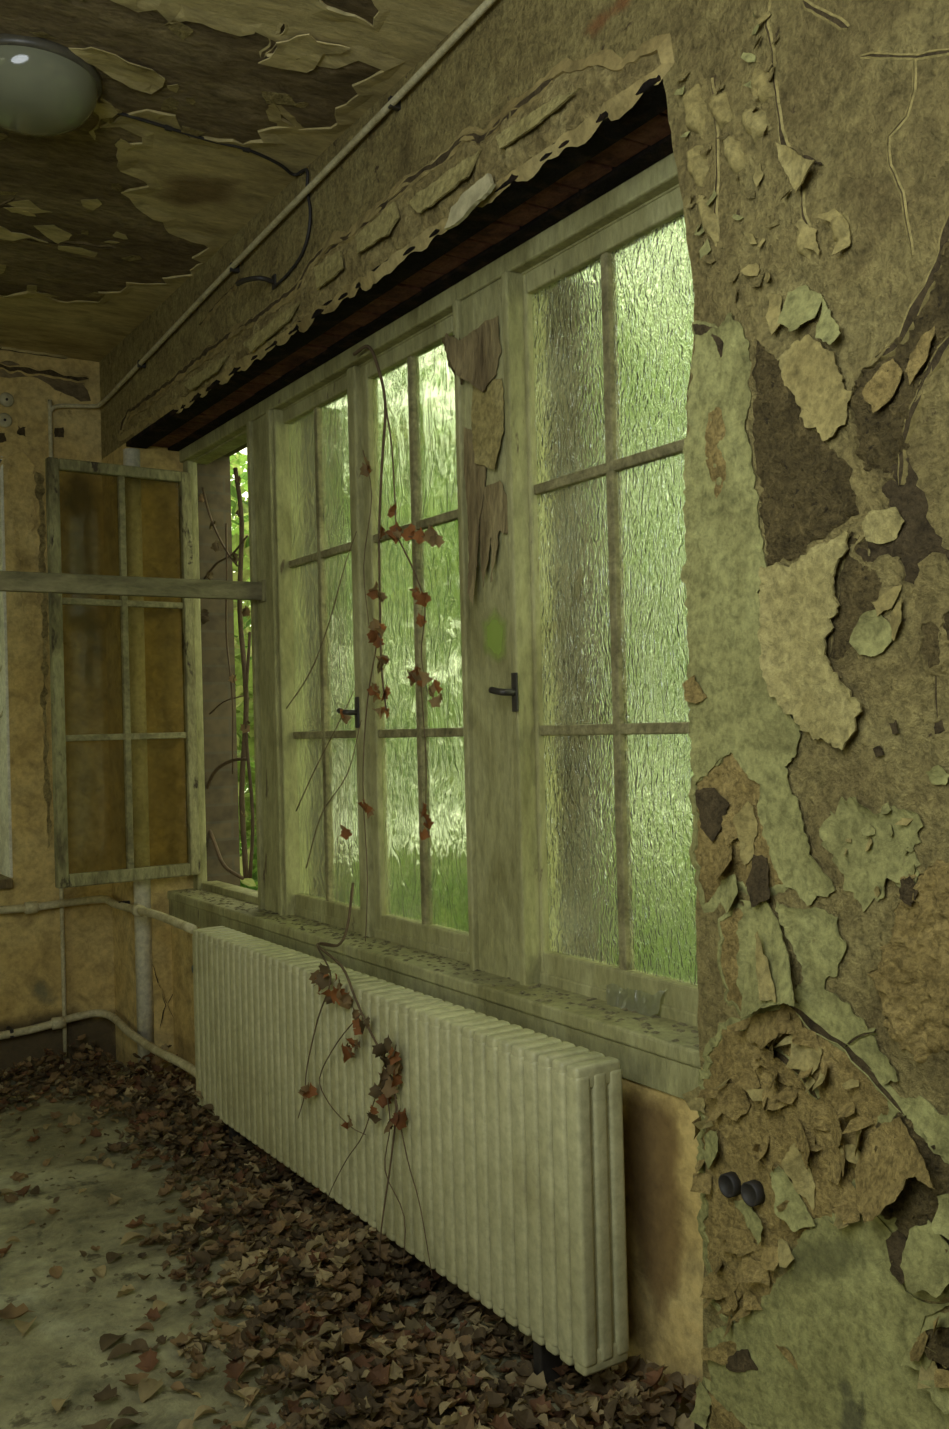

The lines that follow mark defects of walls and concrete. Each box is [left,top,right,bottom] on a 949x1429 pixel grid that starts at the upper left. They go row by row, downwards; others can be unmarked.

flaking render [0,0,406,305]
flaking render [117,33,675,441]
peeling [775,142,822,191]
flaking render [0,426,26,443]
flaking render [33,468,48,573]
flaking render [0,354,97,410]
flaking render [37,593,54,850]
flaking render [680,241,949,1429]
leakage [624,1102,679,1305]